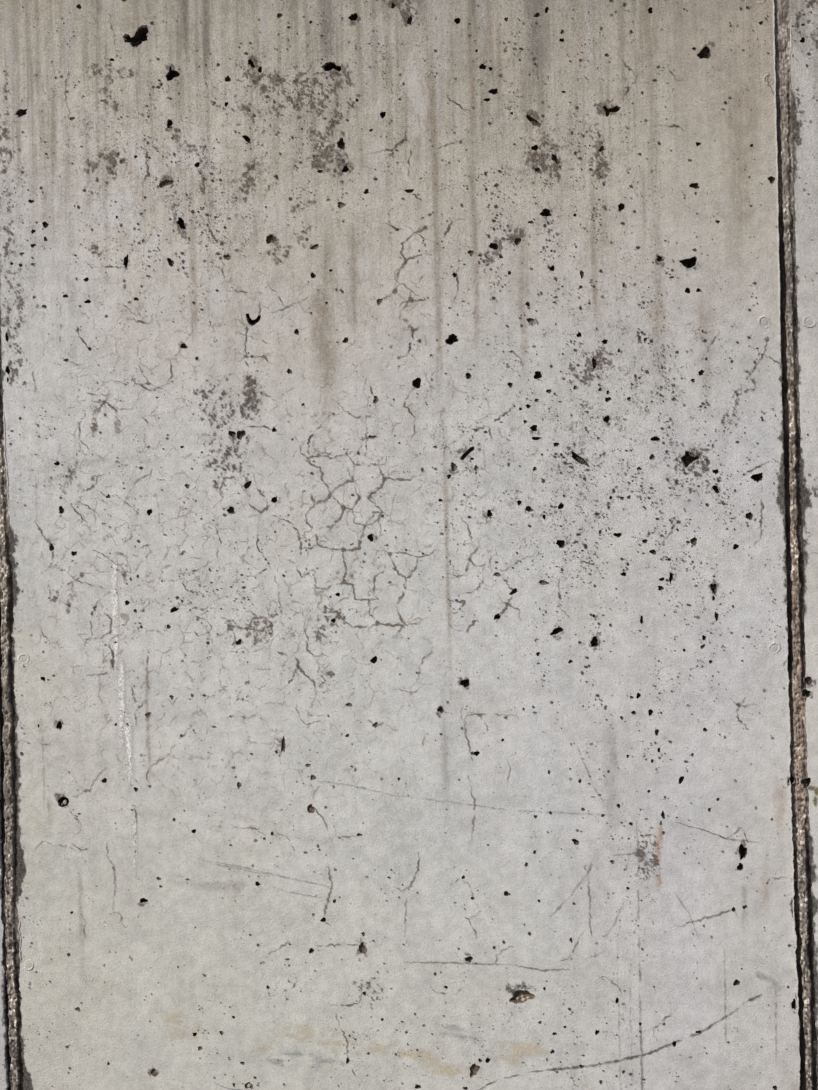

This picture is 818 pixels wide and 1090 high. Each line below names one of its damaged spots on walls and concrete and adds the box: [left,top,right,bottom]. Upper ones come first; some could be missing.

crack [201,166,308,394]
crack [374,130,452,357]
crack [35,523,149,724]
crack [61,468,152,523]
crack [78,351,179,449]
crack [178,387,437,724]
crack [448,519,540,632]